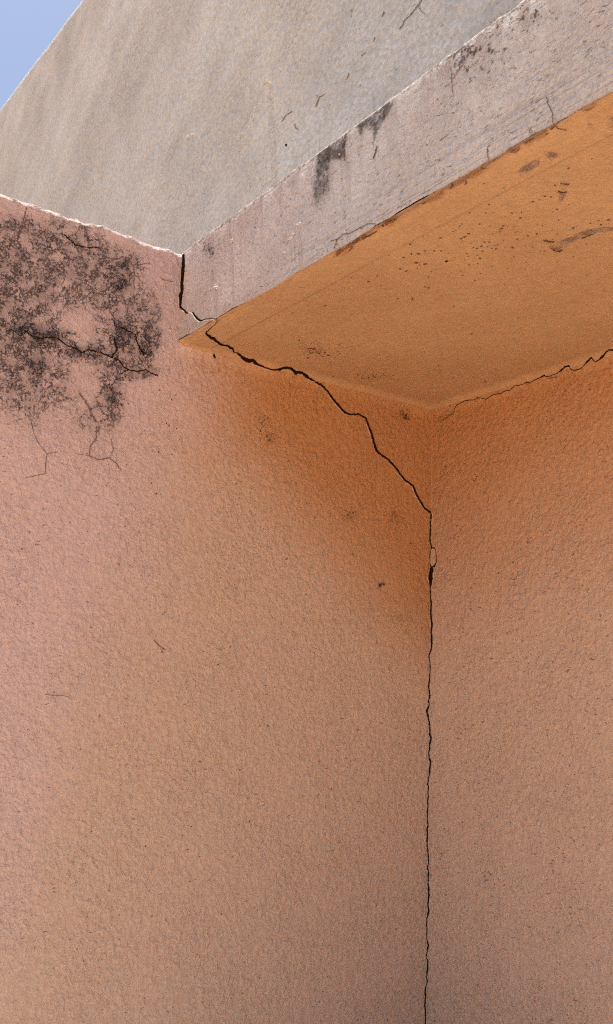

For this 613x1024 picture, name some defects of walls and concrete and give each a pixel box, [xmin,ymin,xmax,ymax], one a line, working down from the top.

damp [357,102,392,135]
damp [315,135,346,197]
damp [0,214,162,432]
crack [443,349,613,420]
crack [25,218,437,1024]